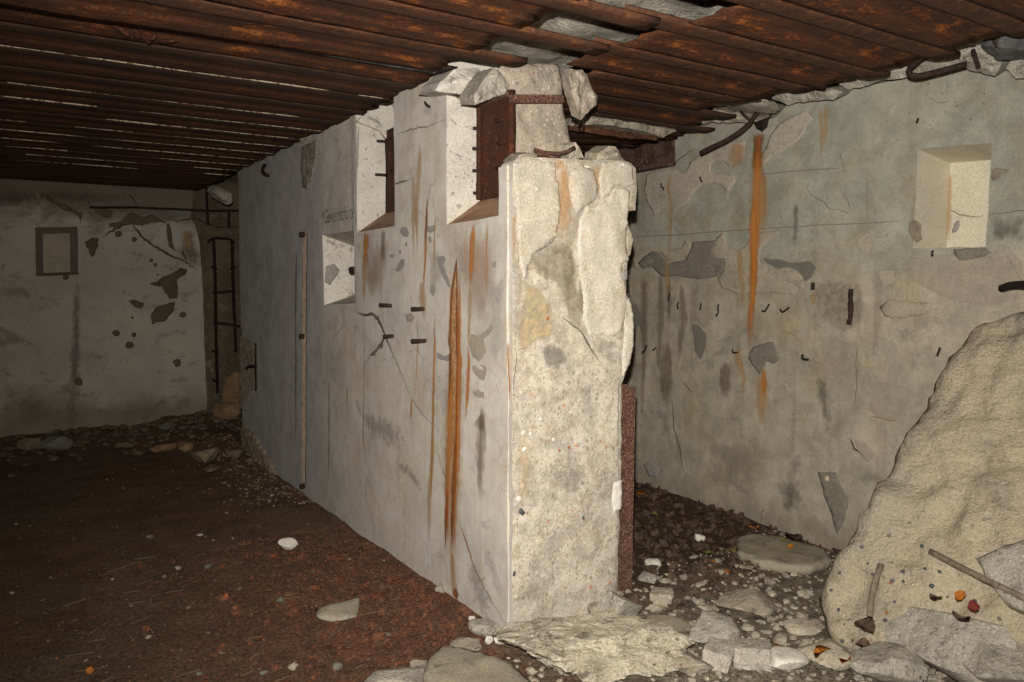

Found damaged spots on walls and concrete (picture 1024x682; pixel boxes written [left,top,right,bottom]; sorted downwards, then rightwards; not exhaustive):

crack [102,194,197,270]
spalling [44,187,257,410]
crack [330,310,429,421]
corrosion [444,261,470,546]
corrosion [470,228,487,278]
peeling [512,110,862,376]
corrosion [739,135,764,336]